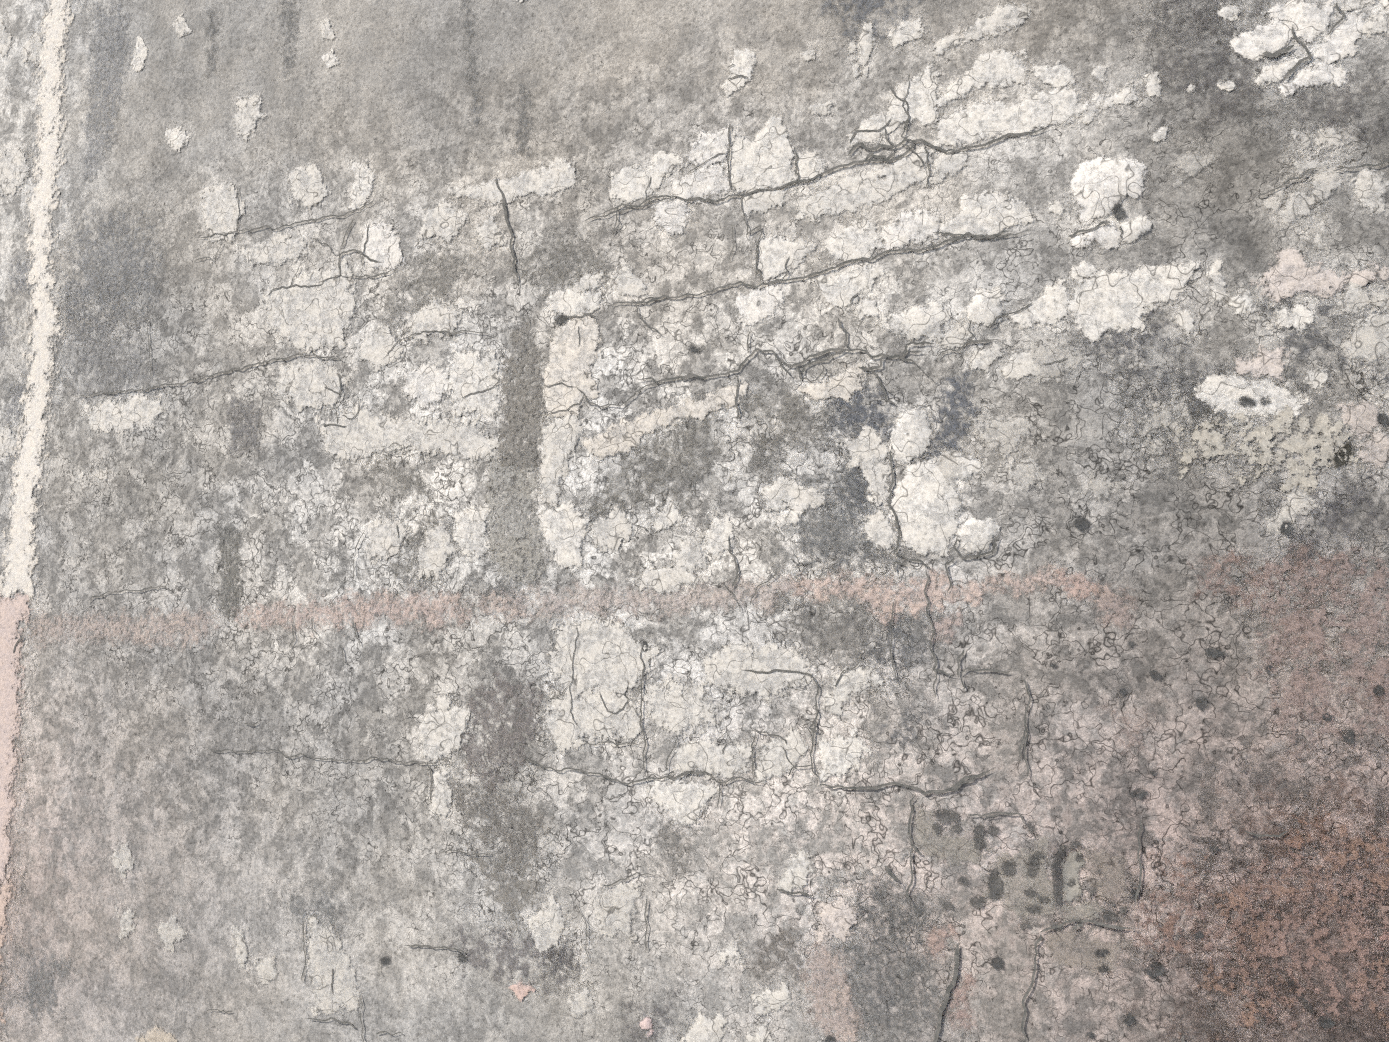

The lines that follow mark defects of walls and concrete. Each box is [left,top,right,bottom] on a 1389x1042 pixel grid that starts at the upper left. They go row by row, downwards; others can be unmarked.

crack [75,320,500,427]
crack [194,186,391,295]
peeling [539,265,751,570]
crack [546,74,1123,421]
peeling [609,3,1161,329]
leakage [1088,313,1160,356]
peeling [934,125,1389,535]
leakage [1141,338,1221,457]
leakage [1156,0,1262,122]
leakage [1283,307,1328,359]
peeling [542,612,886,825]
crack [519,446,1031,905]